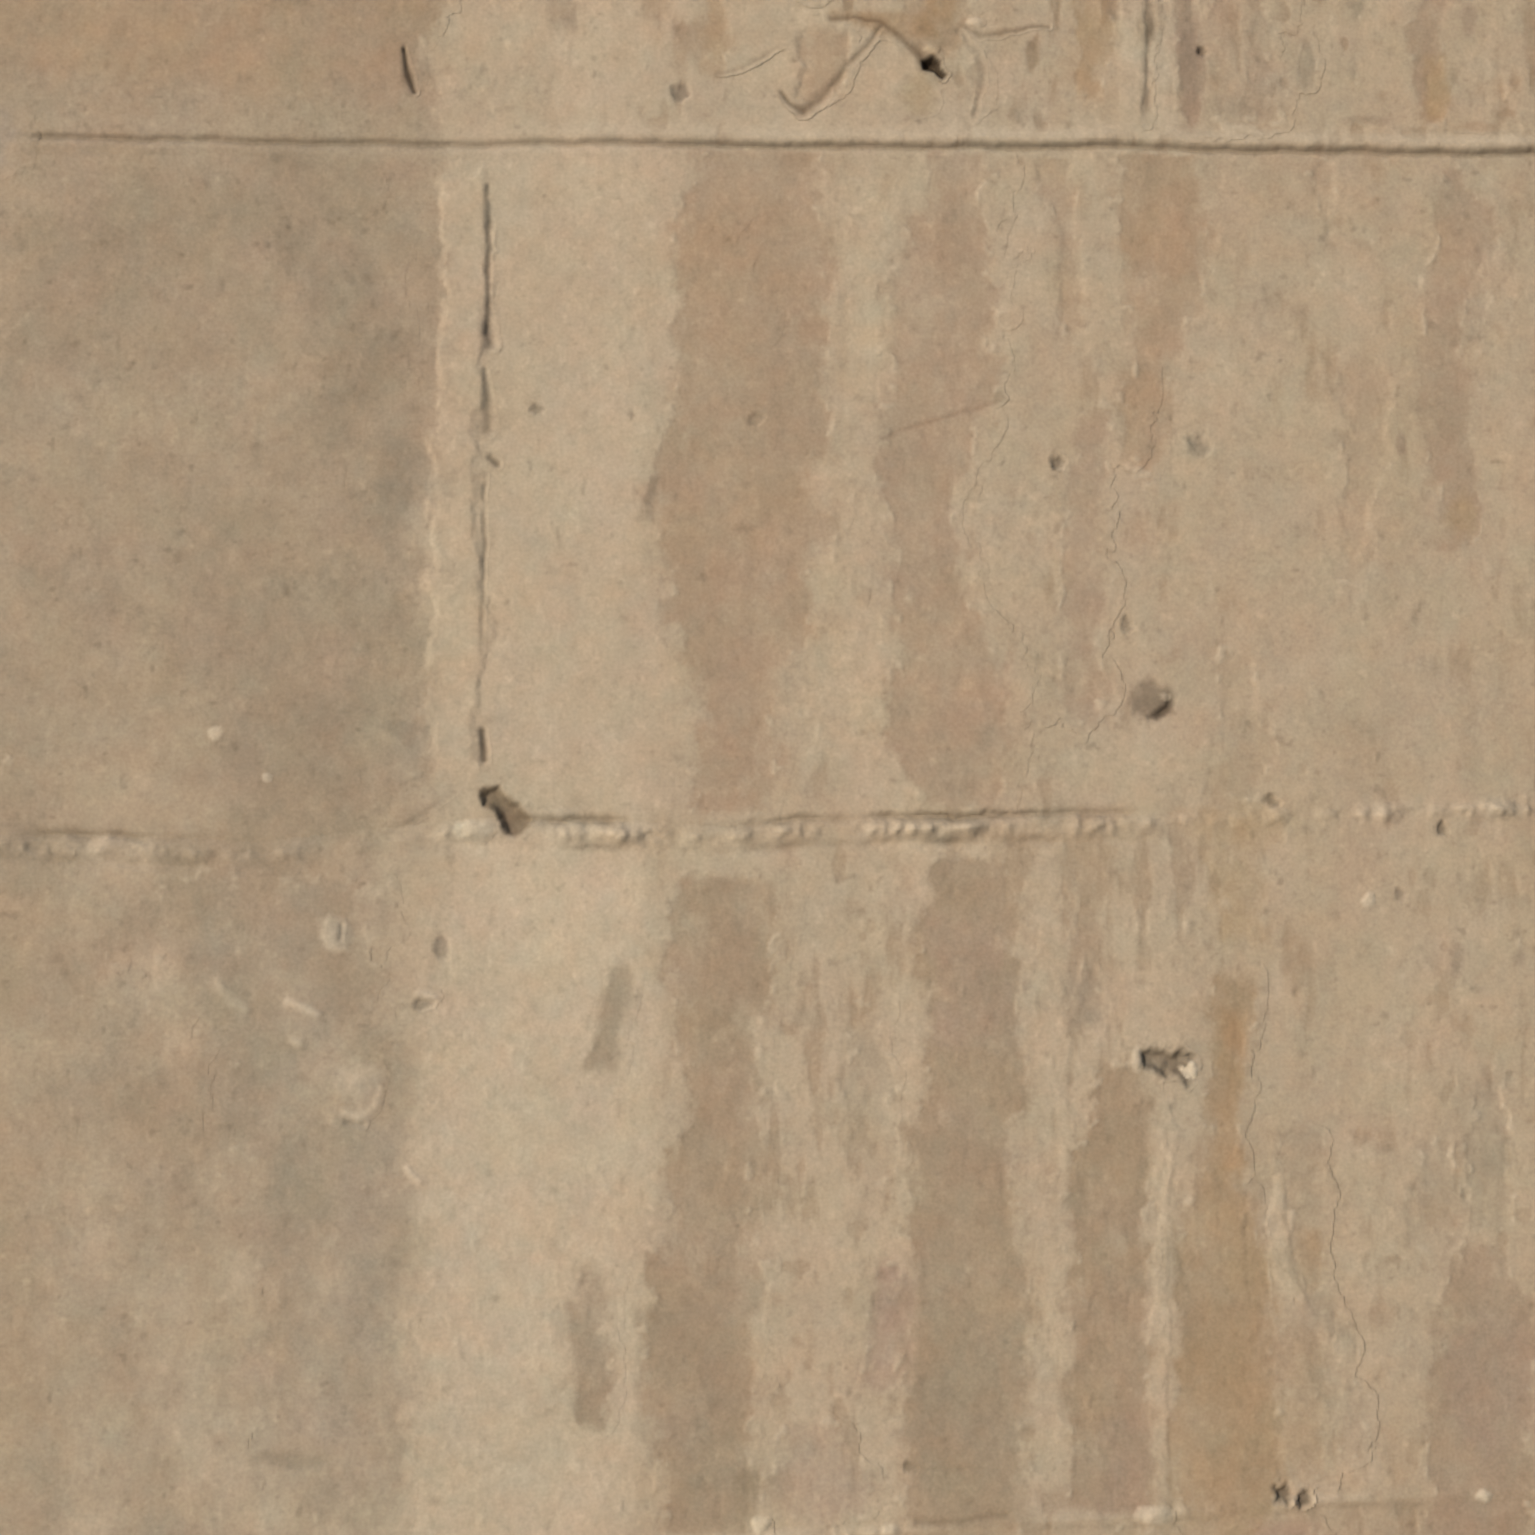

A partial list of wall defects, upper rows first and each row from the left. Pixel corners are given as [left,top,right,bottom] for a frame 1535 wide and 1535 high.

crack [713,11,1053,120]
spalling [1137,0,1166,130]
leakage [1292,156,1352,264]
leakage [629,0,1325,827]
crack [365,180,505,840]
spalling [433,781,585,867]
spalling [1130,1041,1203,1093]
leakage [86,851,1184,1535]
leakage [1250,1120,1379,1492]